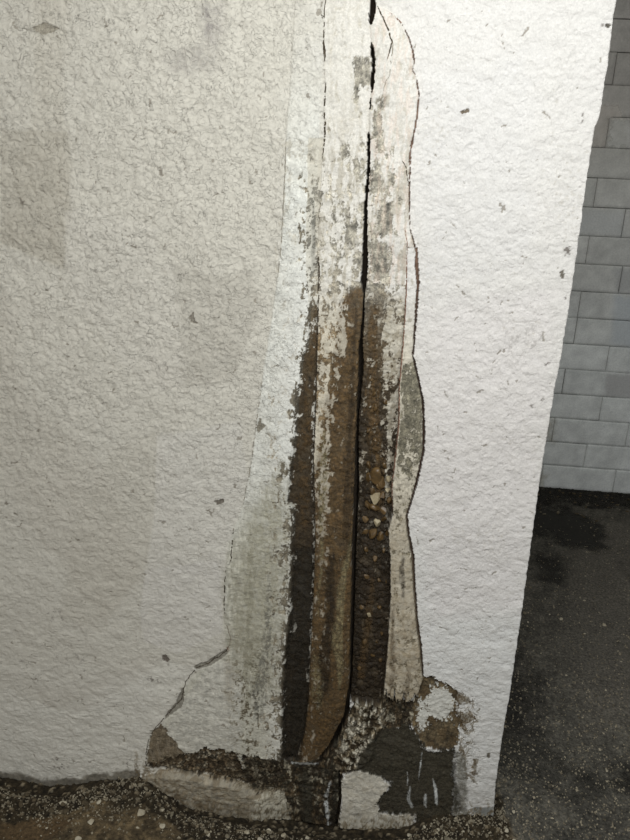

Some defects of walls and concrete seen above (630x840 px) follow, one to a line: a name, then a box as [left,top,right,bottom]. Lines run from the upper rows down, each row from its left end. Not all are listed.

crack [145,528,234,766]
crack [277,147,286,278]
crack [312,252,320,575]
water stain [168,288,468,826]
flaking render [147,0,491,830]
crack [319,0,327,62]
crack [320,83,328,158]
crack [322,132,371,755]
crack [369,0,426,674]